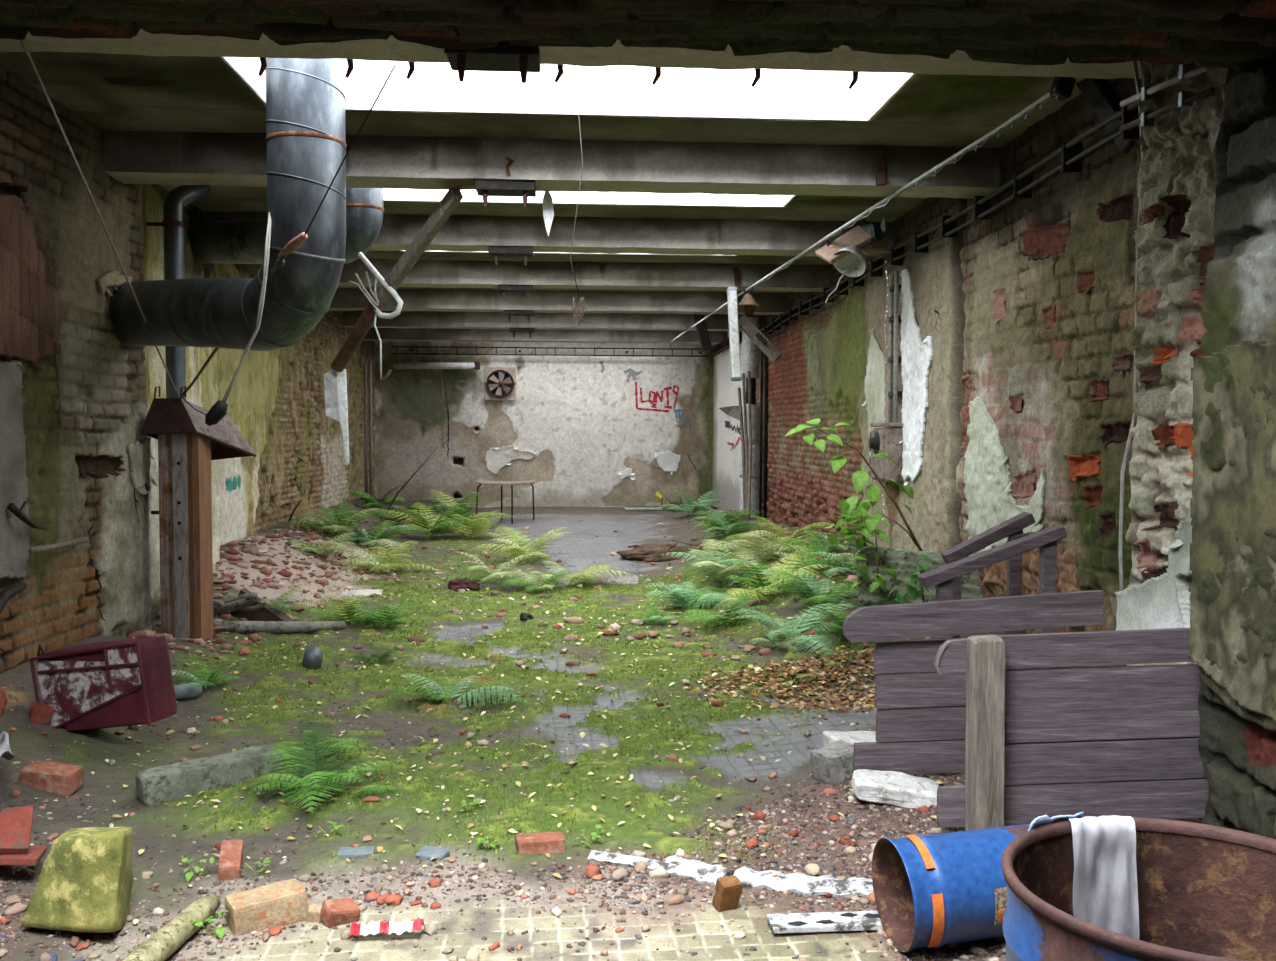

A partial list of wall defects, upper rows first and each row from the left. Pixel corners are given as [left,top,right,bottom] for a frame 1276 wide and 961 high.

spalling [0,182,29,203]
spalling [1022,220,1071,258]
peeling [95,271,133,296]
peeling [899,269,933,485]
spalling [960,375,973,456]
spalling [1007,396,1023,415]
peeling [75,437,158,494]
peeling [485,446,536,475]
peeling [618,468,636,480]
peeling [654,450,681,475]
spalling [1003,472,1037,499]
spalling [1066,421,1133,538]